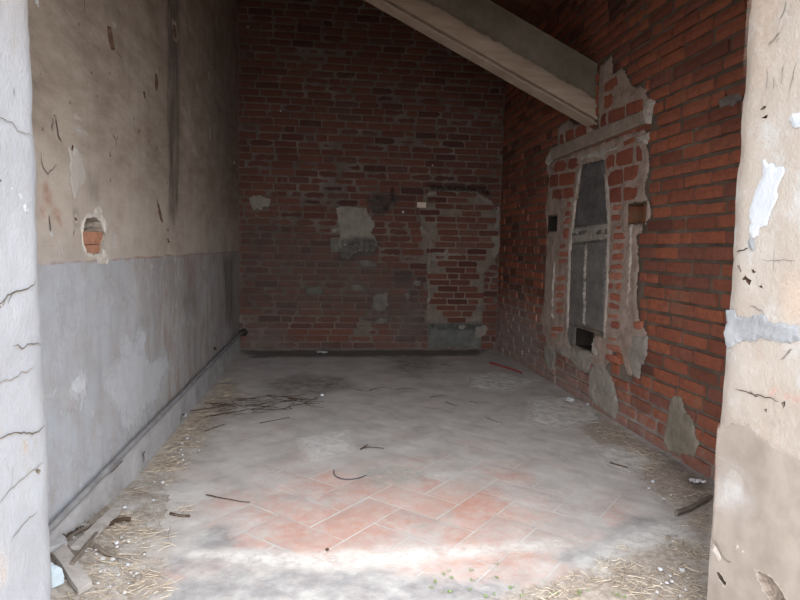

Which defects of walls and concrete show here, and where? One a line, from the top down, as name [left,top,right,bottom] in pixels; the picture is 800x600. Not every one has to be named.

damp [168,0,179,216]
peeling [68,144,86,199]
flaking render [83,231,103,254]
crack [0,281,36,305]
crack [0,425,45,440]
crack [1,463,43,501]
spalling [756,571,786,600]